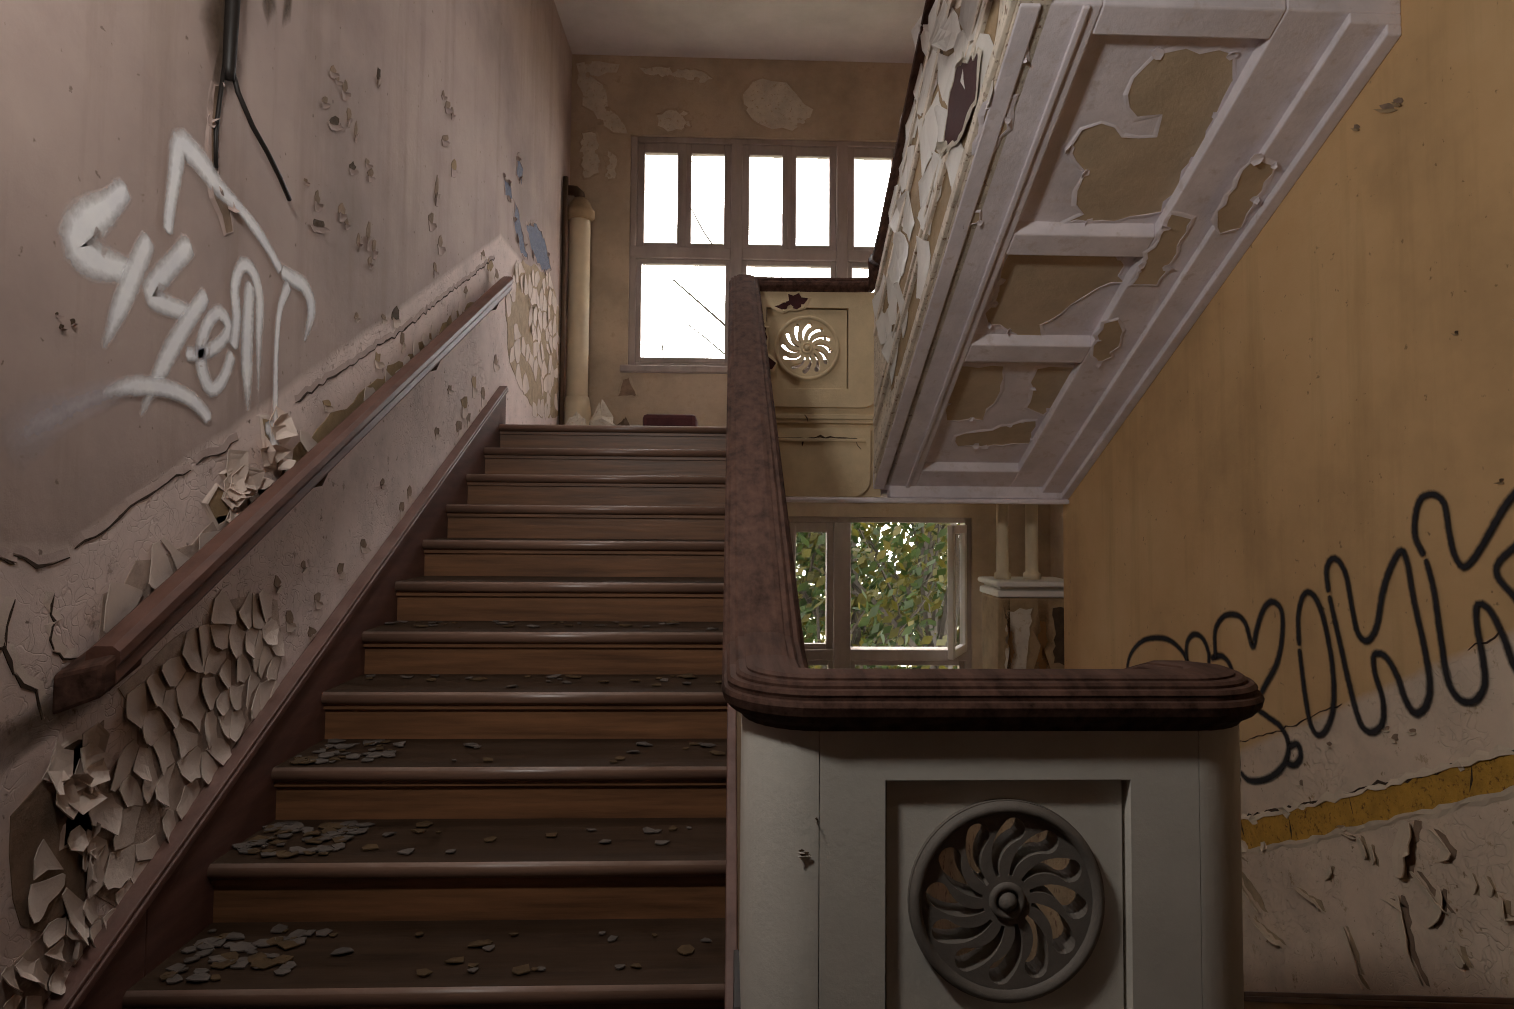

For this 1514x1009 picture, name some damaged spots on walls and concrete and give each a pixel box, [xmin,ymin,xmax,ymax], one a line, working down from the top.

crack [0,432,239,709]
peeling [98,285,474,640]
crack [294,255,495,403]
spalling [428,90,459,279]
spalling [435,376,487,440]
peeling [481,152,560,420]
peeling [740,77,815,132]
peeling [872,0,1019,391]
peeling [943,317,1126,449]
peeling [982,41,1278,336]
peeling [0,575,317,1009]
peeling [1241,755,1514,990]